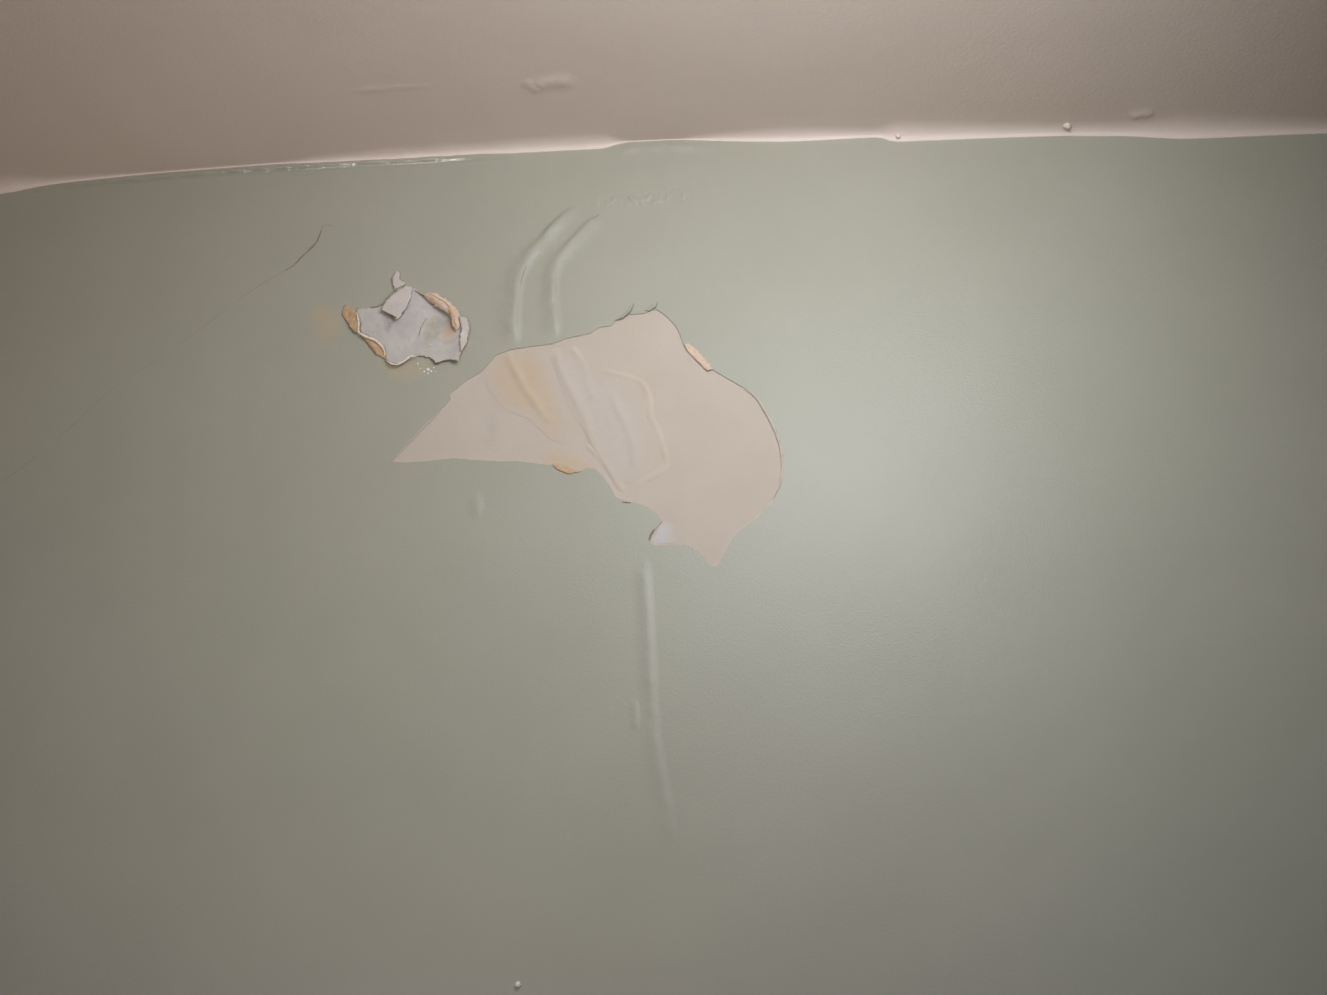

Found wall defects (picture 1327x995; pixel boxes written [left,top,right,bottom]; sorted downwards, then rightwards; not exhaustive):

peeling [342,271,469,374]
peeling [392,302,784,567]